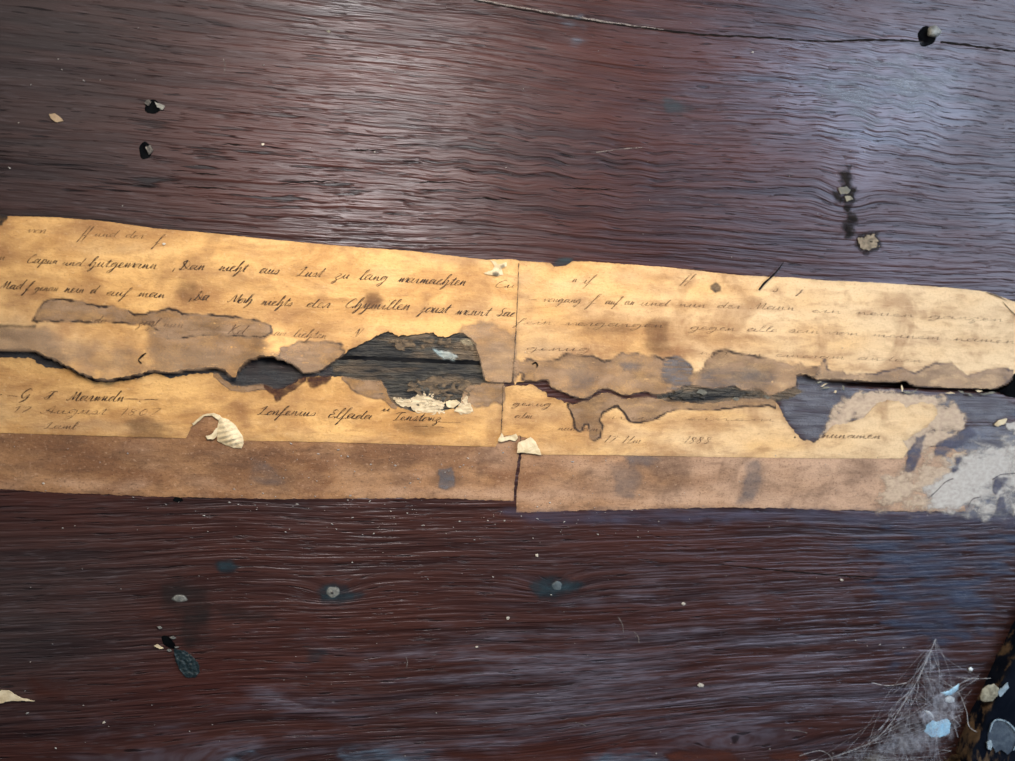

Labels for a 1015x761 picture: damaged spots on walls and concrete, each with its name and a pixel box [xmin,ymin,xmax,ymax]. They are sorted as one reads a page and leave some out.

crack [474,0,1015,52]
peeling [0,349,335,389]
peeling [668,388,710,400]